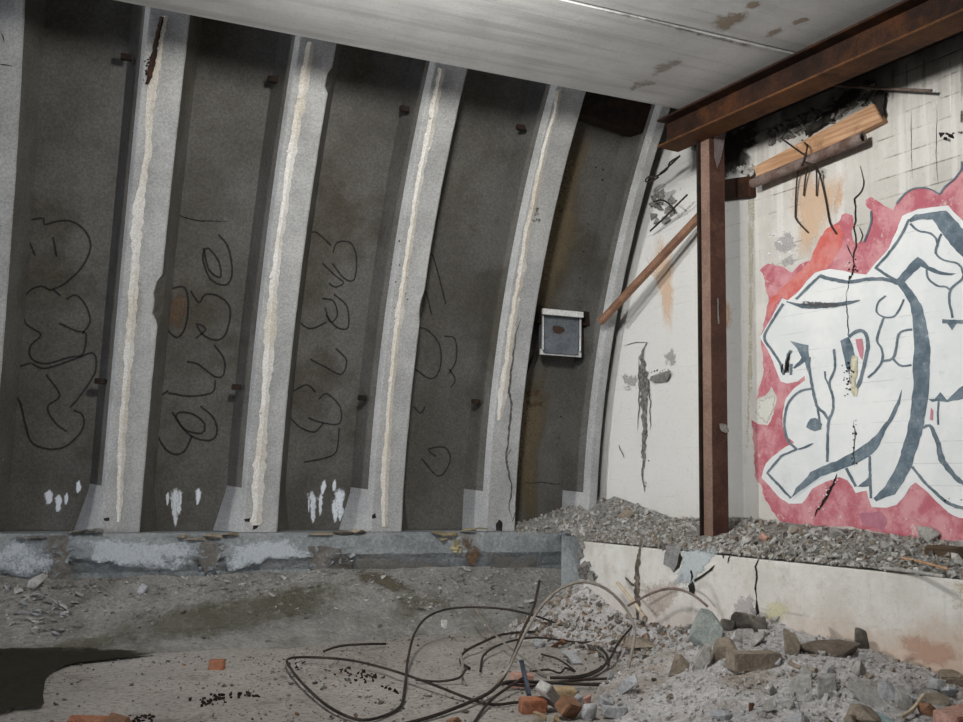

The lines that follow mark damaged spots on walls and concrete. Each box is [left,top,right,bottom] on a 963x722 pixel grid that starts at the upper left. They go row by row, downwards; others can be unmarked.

crack [846,167,864,337]
crack [841,362,854,396]
crack [505,320,553,522]
crack [808,420,858,519]
spalling [18,517,109,580]
spalling [307,529,367,571]
crack [753,556,761,616]
water stain [0,647,154,713]